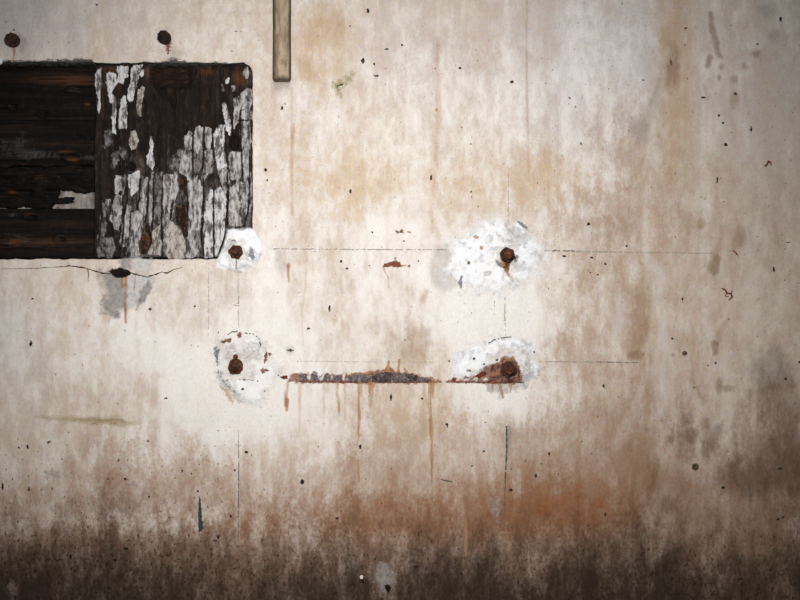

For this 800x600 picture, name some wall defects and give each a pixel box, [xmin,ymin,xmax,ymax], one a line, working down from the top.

peeling [95,64,253,322]
crack [8,265,111,277]
crack [130,267,181,278]
rust [278,356,524,397]